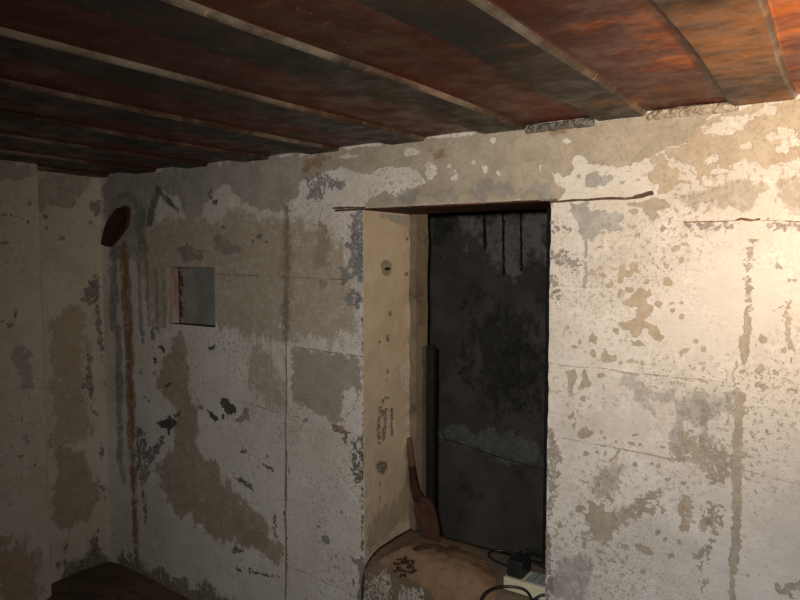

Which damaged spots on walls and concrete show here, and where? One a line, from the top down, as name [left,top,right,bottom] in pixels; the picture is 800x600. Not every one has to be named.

damp [102,152,355,346]
crack [550,191,654,203]
peeling [81,274,105,399]
rust [119,242,139,566]
spalling [157,411,181,436]
spalling [198,398,250,424]
peeling [281,99,800,600]